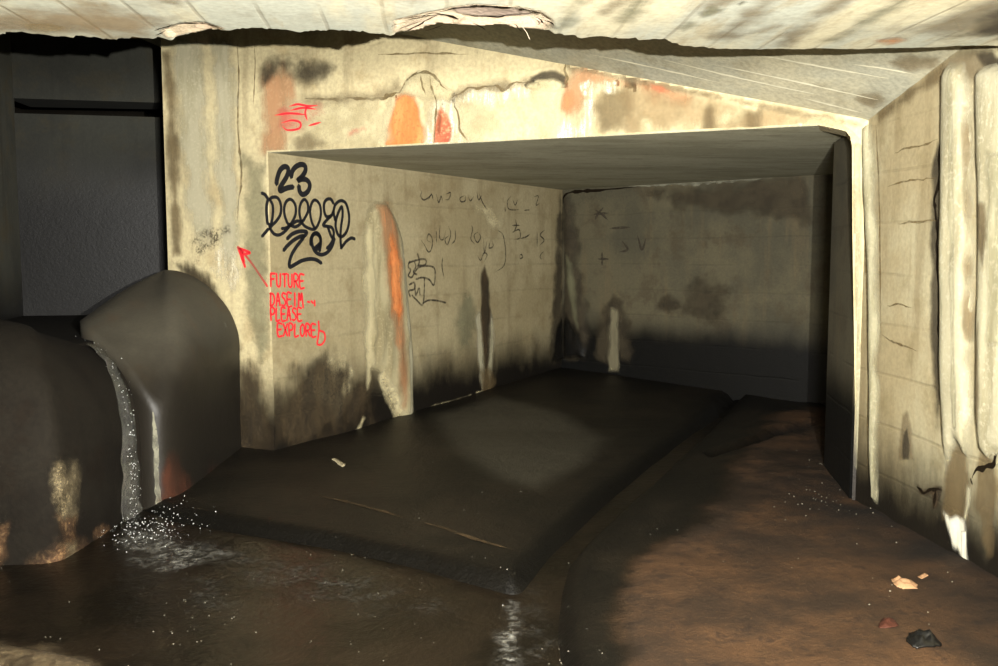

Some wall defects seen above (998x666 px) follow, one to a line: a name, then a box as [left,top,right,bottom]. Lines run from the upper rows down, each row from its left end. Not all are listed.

spalling [155,22,224,37]
spalling [394,4,554,32]
leakage [933,3,998,35]
crack [378,49,454,57]
crack [306,92,398,102]
crack [452,81,523,98]
corrosion [376,92,470,147]
leakage [180,265,218,296]
crack [883,142,940,406]
leakage [240,203,413,449]
crack [970,454,998,485]